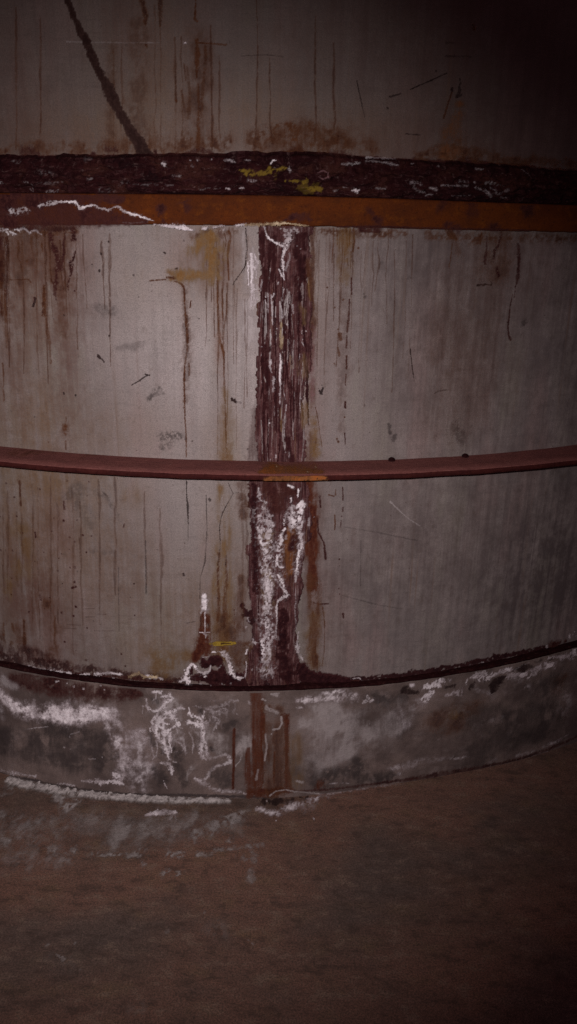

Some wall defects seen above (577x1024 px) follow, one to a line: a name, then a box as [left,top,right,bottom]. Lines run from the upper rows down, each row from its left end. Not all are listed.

corrosion [0,193,546,799]
water stain [0,485,577,830]